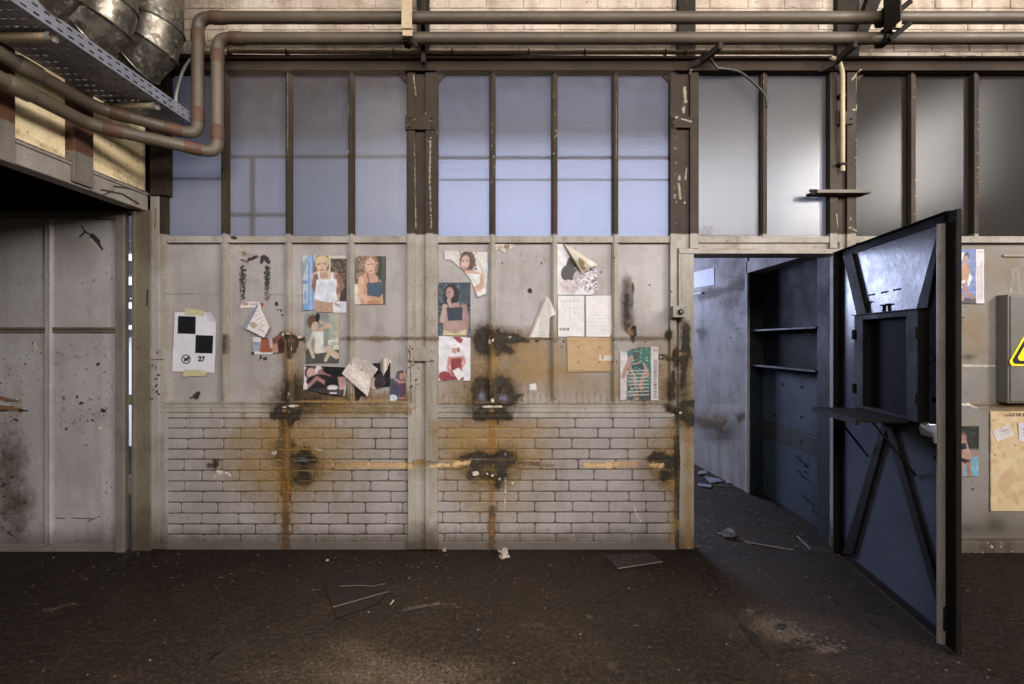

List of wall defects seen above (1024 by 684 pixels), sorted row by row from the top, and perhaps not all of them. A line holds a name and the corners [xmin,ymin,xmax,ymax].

rust [249,409,323,550]
rust [448,418,529,550]